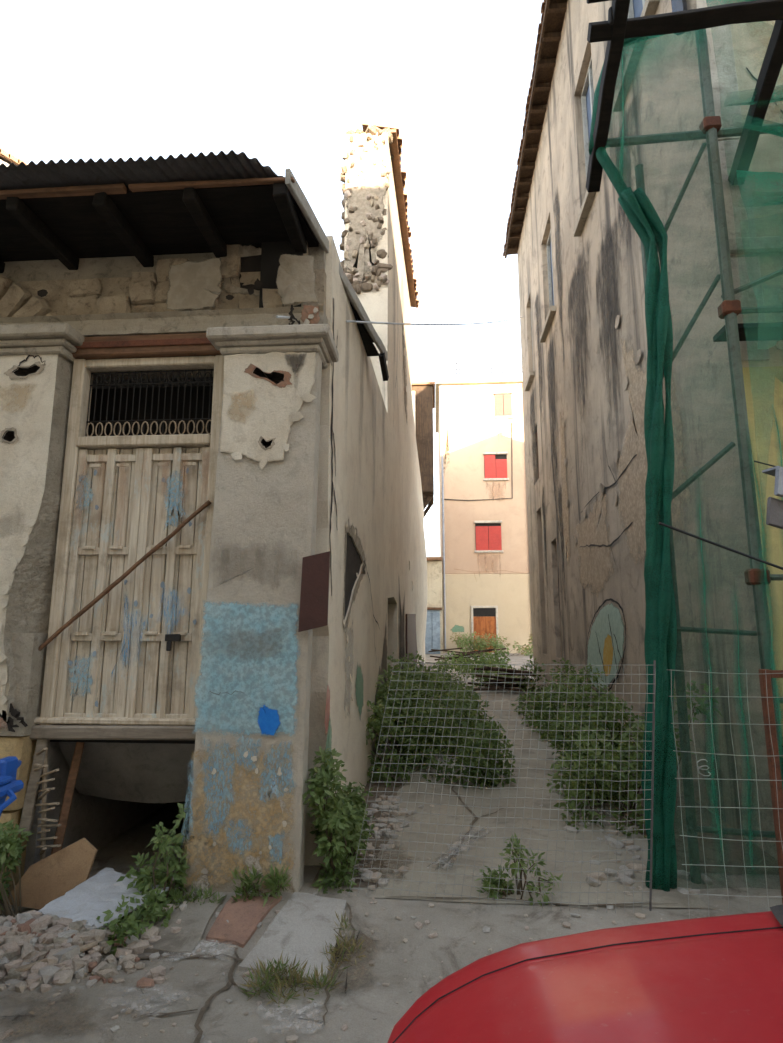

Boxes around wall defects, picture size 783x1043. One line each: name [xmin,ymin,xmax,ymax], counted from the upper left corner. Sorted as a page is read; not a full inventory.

hole [0,428,18,444]
hole [4,355,46,380]
flaking render [220,352,317,469]
leakage [530,191,630,595]
flaking render [0,490,61,727]
crack [549,428,637,668]
peeling [181,735,294,892]